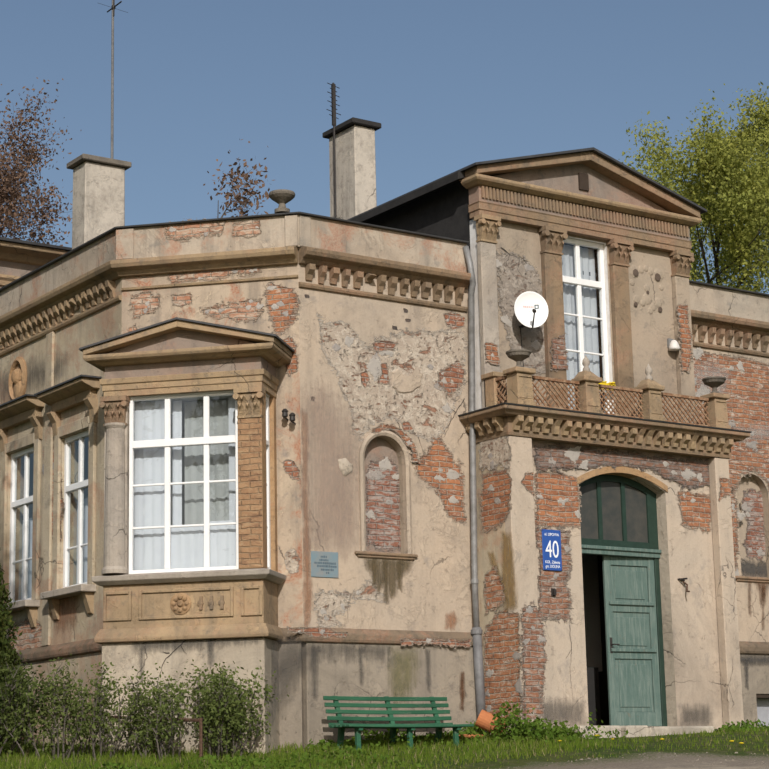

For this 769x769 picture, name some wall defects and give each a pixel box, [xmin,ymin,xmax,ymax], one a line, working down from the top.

spalling [163,219,261,243]
spalling [168,267,262,284]
spalling [129,291,161,332]
spalling [171,282,310,376]
peeling [314,308,468,525]
spalling [365,456,401,553]
spalling [478,303,769,722]
peeling [286,577,388,638]
leakage [367,559,410,602]
leakage [740,656,769,687]